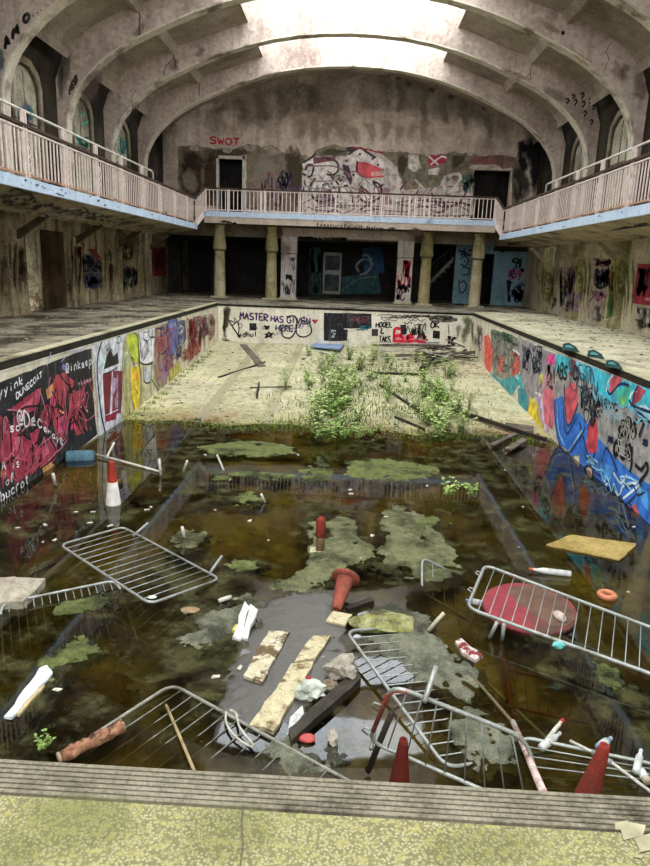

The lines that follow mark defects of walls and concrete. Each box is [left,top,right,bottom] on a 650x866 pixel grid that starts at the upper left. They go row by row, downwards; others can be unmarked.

spalling [177,144,355,214]
leakage [512,137,542,200]
leakage [610,261,643,329]